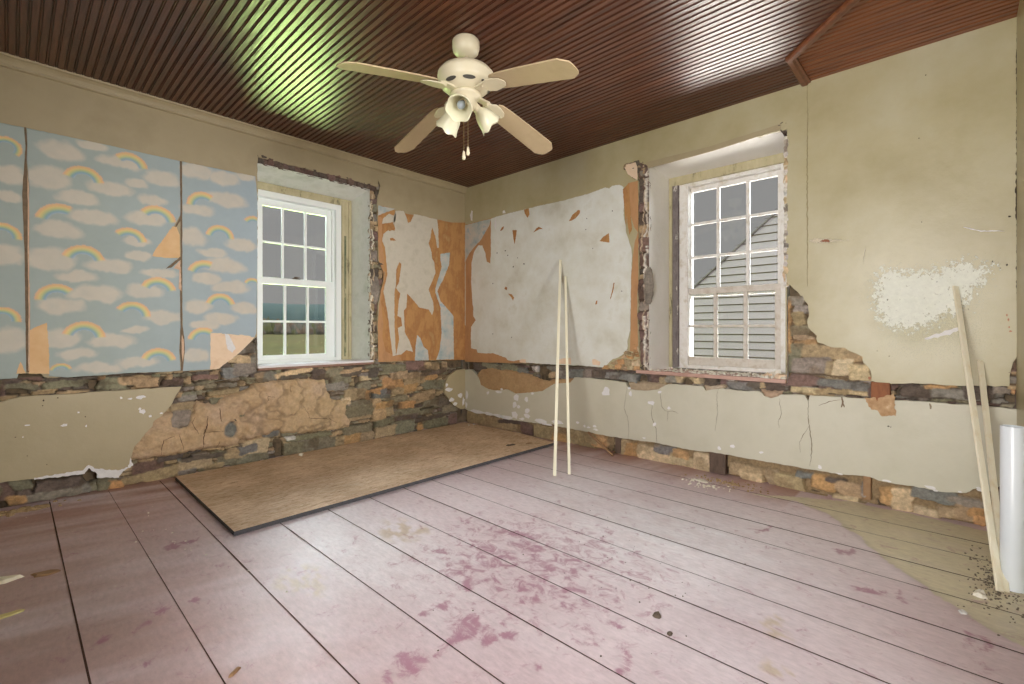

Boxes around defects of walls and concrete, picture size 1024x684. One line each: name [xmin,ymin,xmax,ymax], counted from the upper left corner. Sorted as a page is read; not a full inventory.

flaking render [0,122,1017,526]
crack [799,397,845,462]